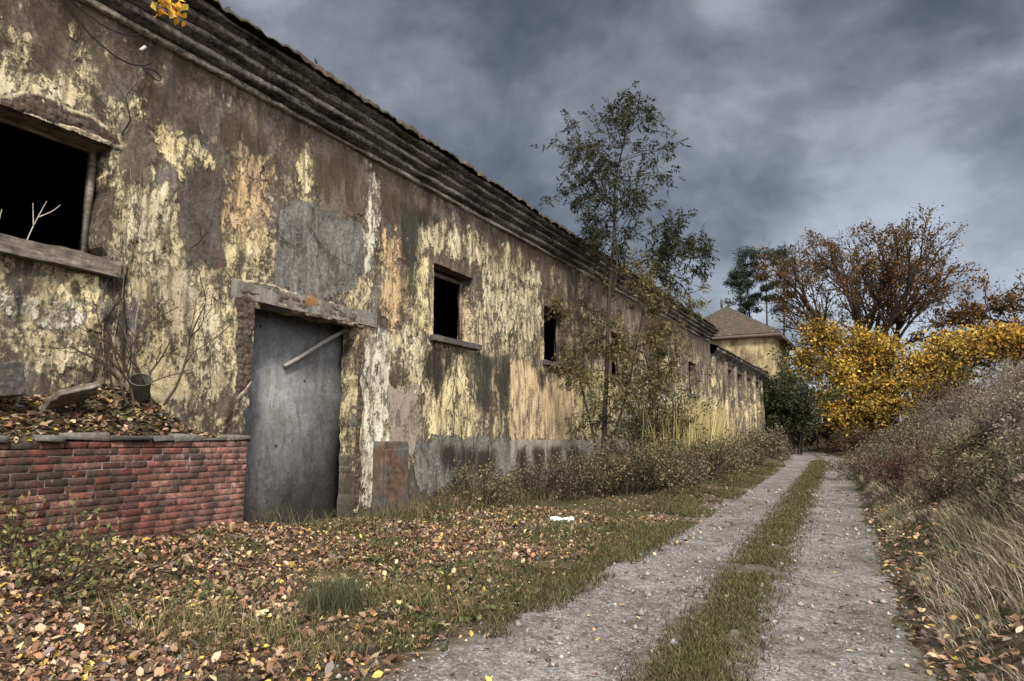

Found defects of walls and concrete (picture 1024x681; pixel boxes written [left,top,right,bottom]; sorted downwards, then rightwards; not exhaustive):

flaking render [0,15,682,513]
damp [424,348,453,404]
damp [469,351,510,420]
damp [442,445,495,481]
damp [518,445,580,476]